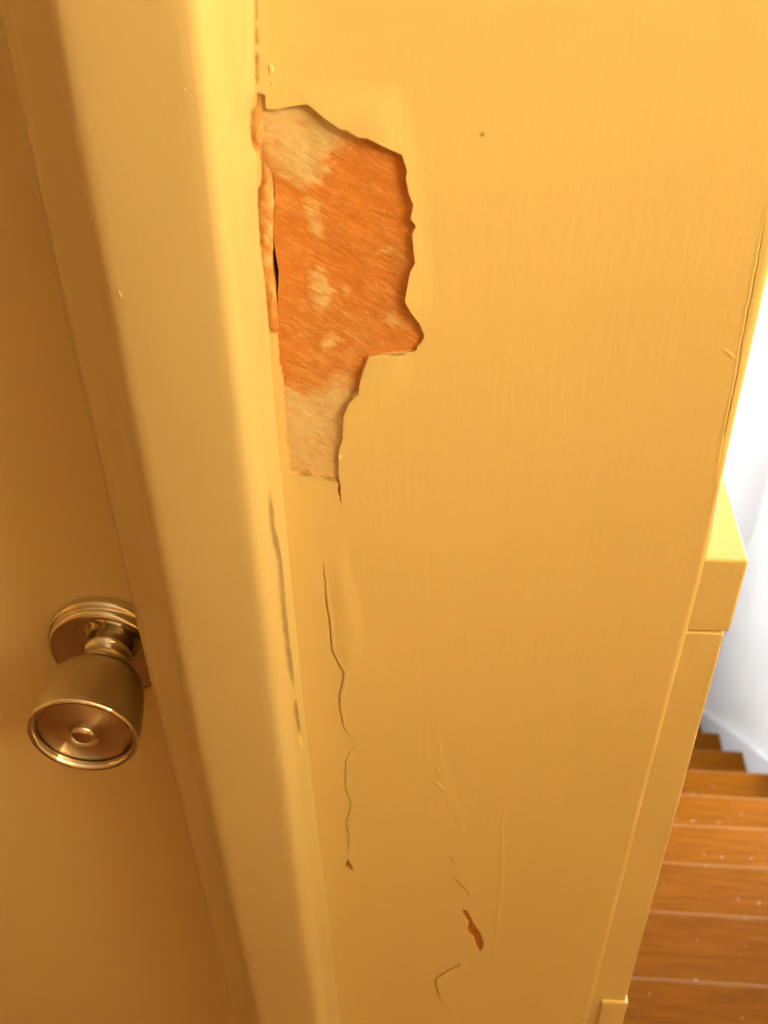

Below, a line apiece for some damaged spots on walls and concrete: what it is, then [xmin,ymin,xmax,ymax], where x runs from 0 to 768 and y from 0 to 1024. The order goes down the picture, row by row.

peeling [250,92,424,503]
crack [323,562,358,871]
peeling [461,908,486,952]